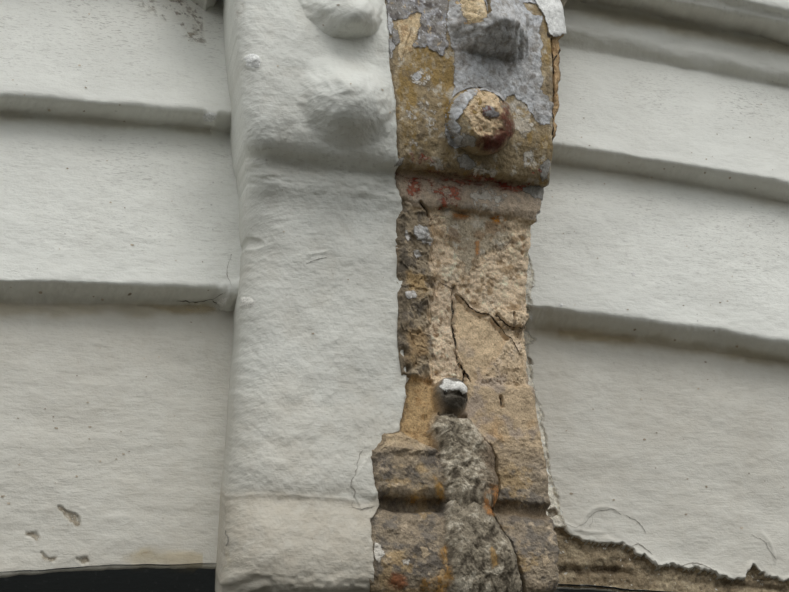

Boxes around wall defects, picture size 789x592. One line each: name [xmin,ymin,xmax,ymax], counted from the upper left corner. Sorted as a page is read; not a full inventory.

rust [478,105,515,151]
crack [440,282,527,382]
flaking render [369,0,789,592]
peeling [58,507,79,526]